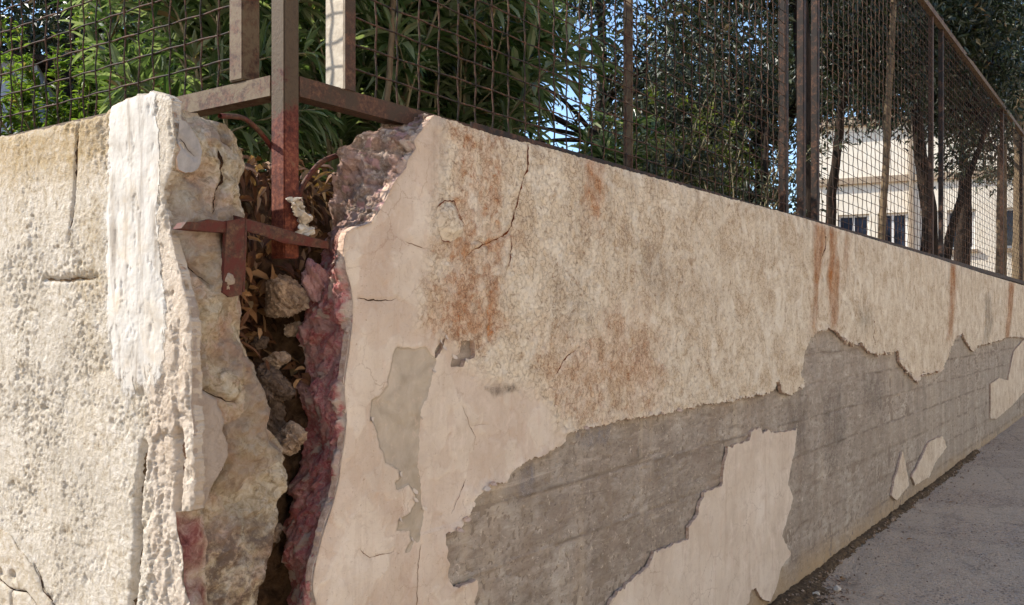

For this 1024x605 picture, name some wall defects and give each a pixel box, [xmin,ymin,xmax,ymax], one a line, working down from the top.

crack [70,127,80,229]
crack [213,140,224,212]
crack [467,147,529,276]
crack [48,275,99,283]
corrosion [814,227,839,320]
spalling [167,98,288,605]
spalling [446,330,1024,605]